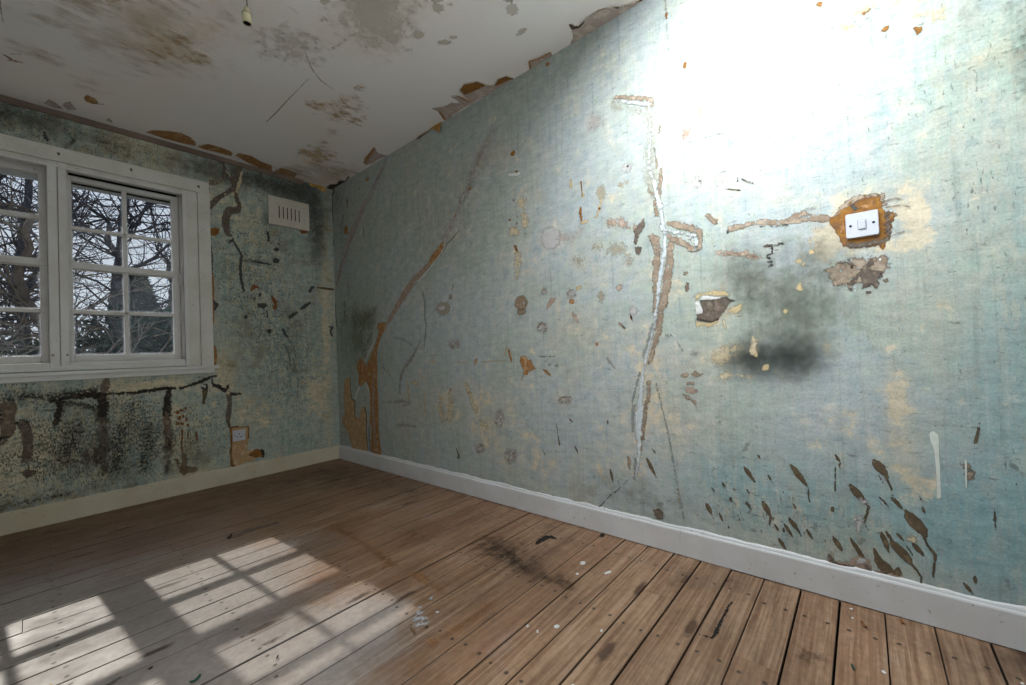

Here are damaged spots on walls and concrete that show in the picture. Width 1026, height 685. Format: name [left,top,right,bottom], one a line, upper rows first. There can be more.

spalling [912,8,946,35]
spalling [821,193,910,294]
spalling [683,271,742,329]
peeling [709,336,769,380]
flaking render [342,378,368,451]
spalling [0,400,37,478]
leakage [175,453,198,475]
flaking render [229,426,265,467]
spalling [827,552,902,577]